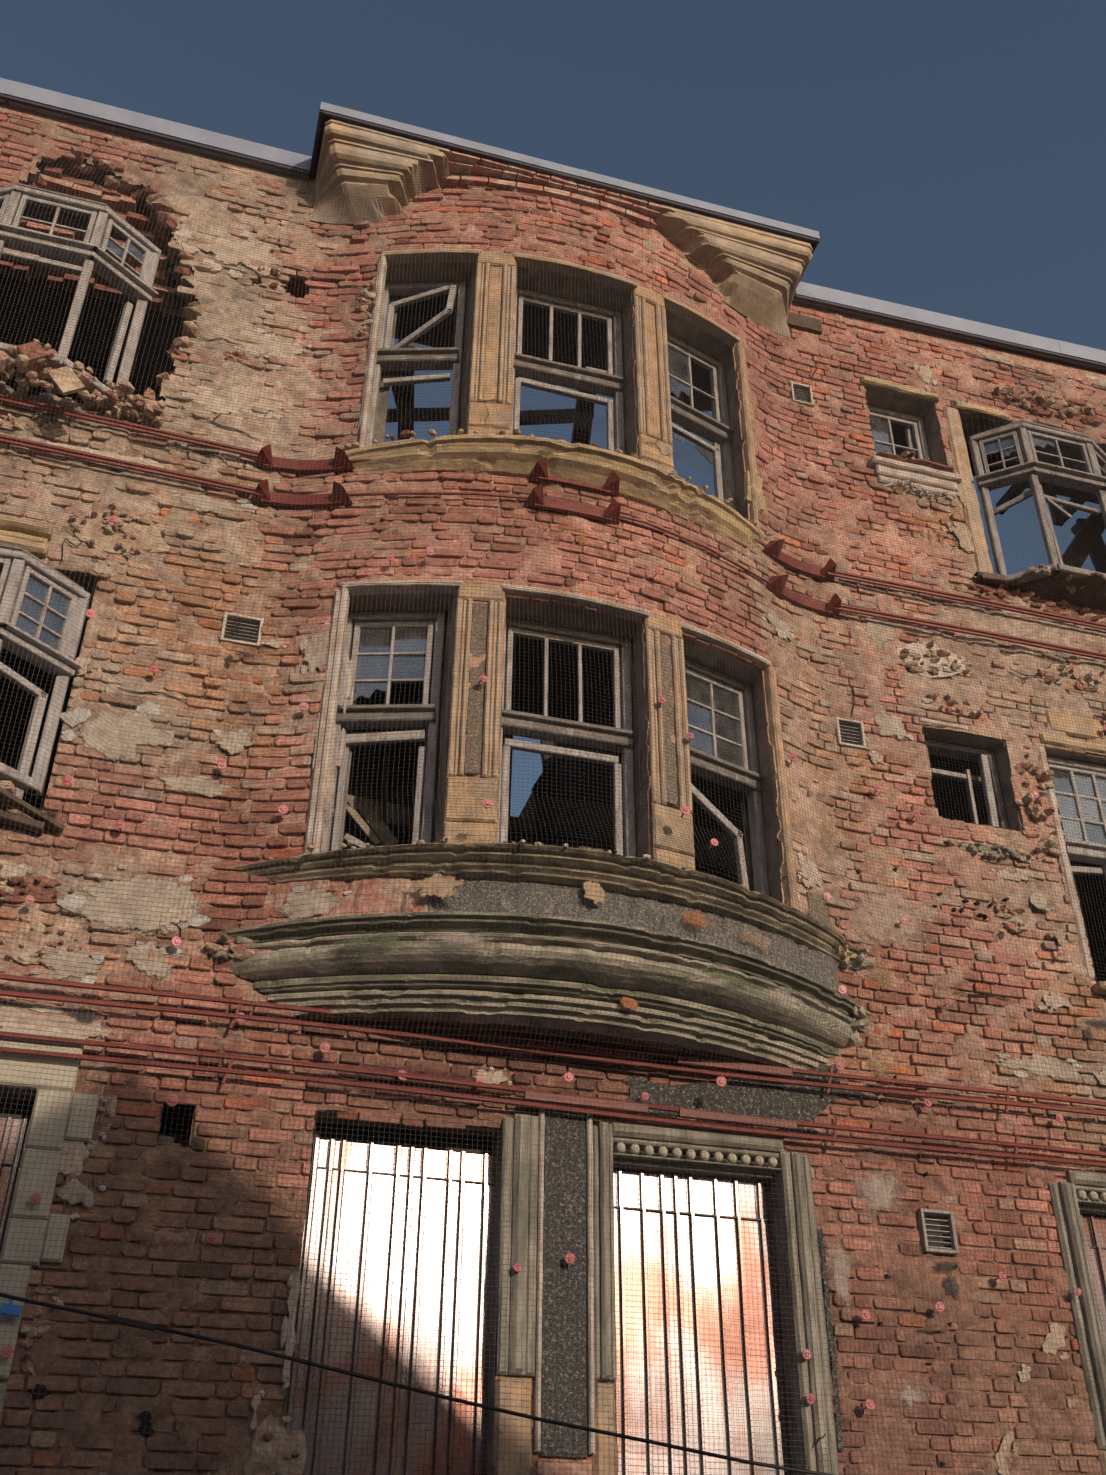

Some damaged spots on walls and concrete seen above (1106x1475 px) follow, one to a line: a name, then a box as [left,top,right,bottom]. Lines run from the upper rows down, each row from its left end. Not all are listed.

spalling [0,145,315,420]
peeling [60,701,180,761]
peeling [213,729,254,755]
flaking render [413,873,464,897]
flaking render [583,881,606,904]
peeling [0,859,255,984]
peeling [621,1057,693,1086]
peeling [987,1053,1106,1085]
peeling [280,1271,301,1391]
peeling [1042,1323,1069,1360]
spalling [250,1390,307,1475]